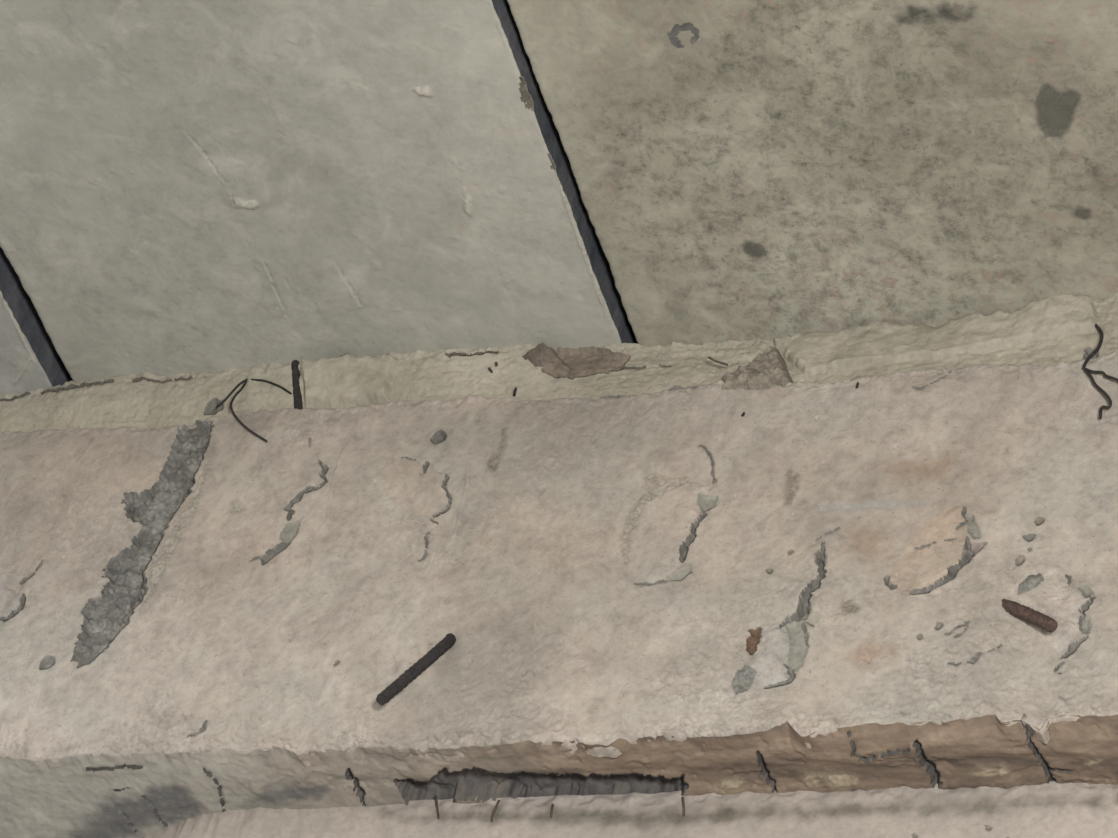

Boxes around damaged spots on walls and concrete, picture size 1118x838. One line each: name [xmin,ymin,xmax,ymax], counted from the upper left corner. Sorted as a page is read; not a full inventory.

spalling [70,420,214,669]
crack [249,437,329,566]
crack [401,456,452,562]
crack [634,445,719,586]
crack [779,527,841,647]
crack [883,506,988,595]
crack [1054,585,1095,675]